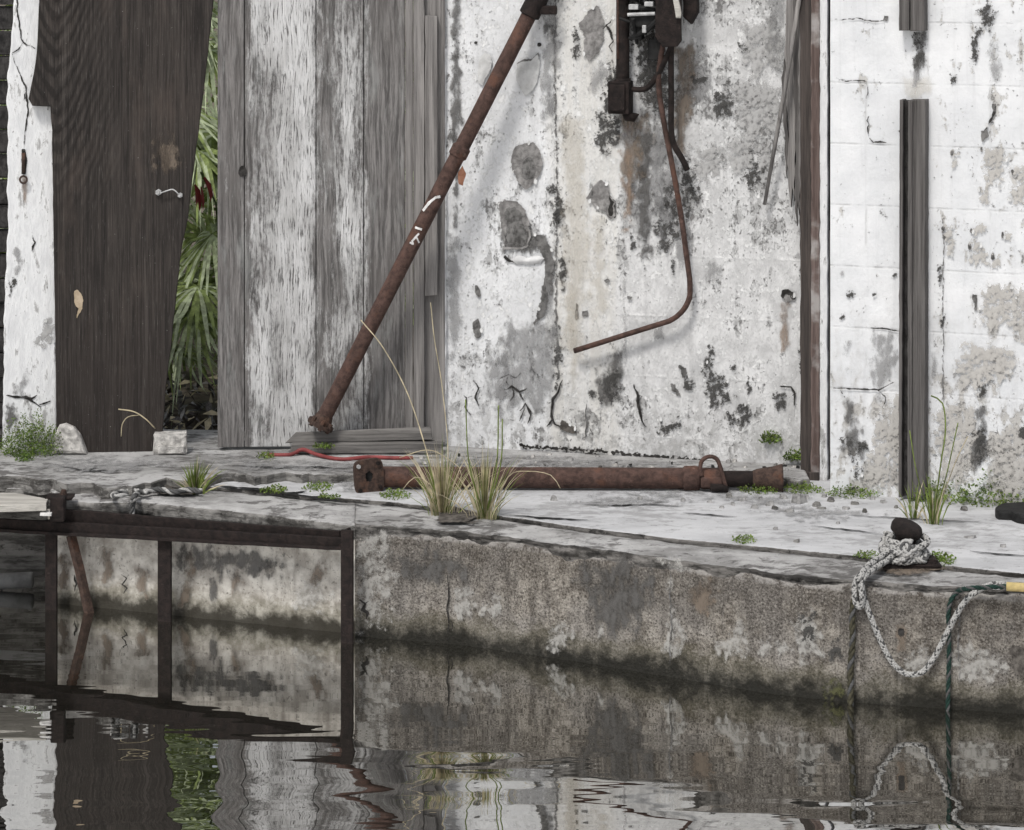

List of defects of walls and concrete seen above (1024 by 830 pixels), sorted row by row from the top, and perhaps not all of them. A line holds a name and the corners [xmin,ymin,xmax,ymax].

peeling [579,5,604,60]
crack [12,0,35,144]
spalling [511,141,543,189]
spalling [586,180,616,219]
crack [464,0,700,460]
spalling [498,199,554,353]
crack [6,395,50,408]
water stain [681,345,752,437]
crack [837,382,894,407]
water stain [546,626,574,653]
water stain [664,609,685,656]
water stain [951,643,1009,682]